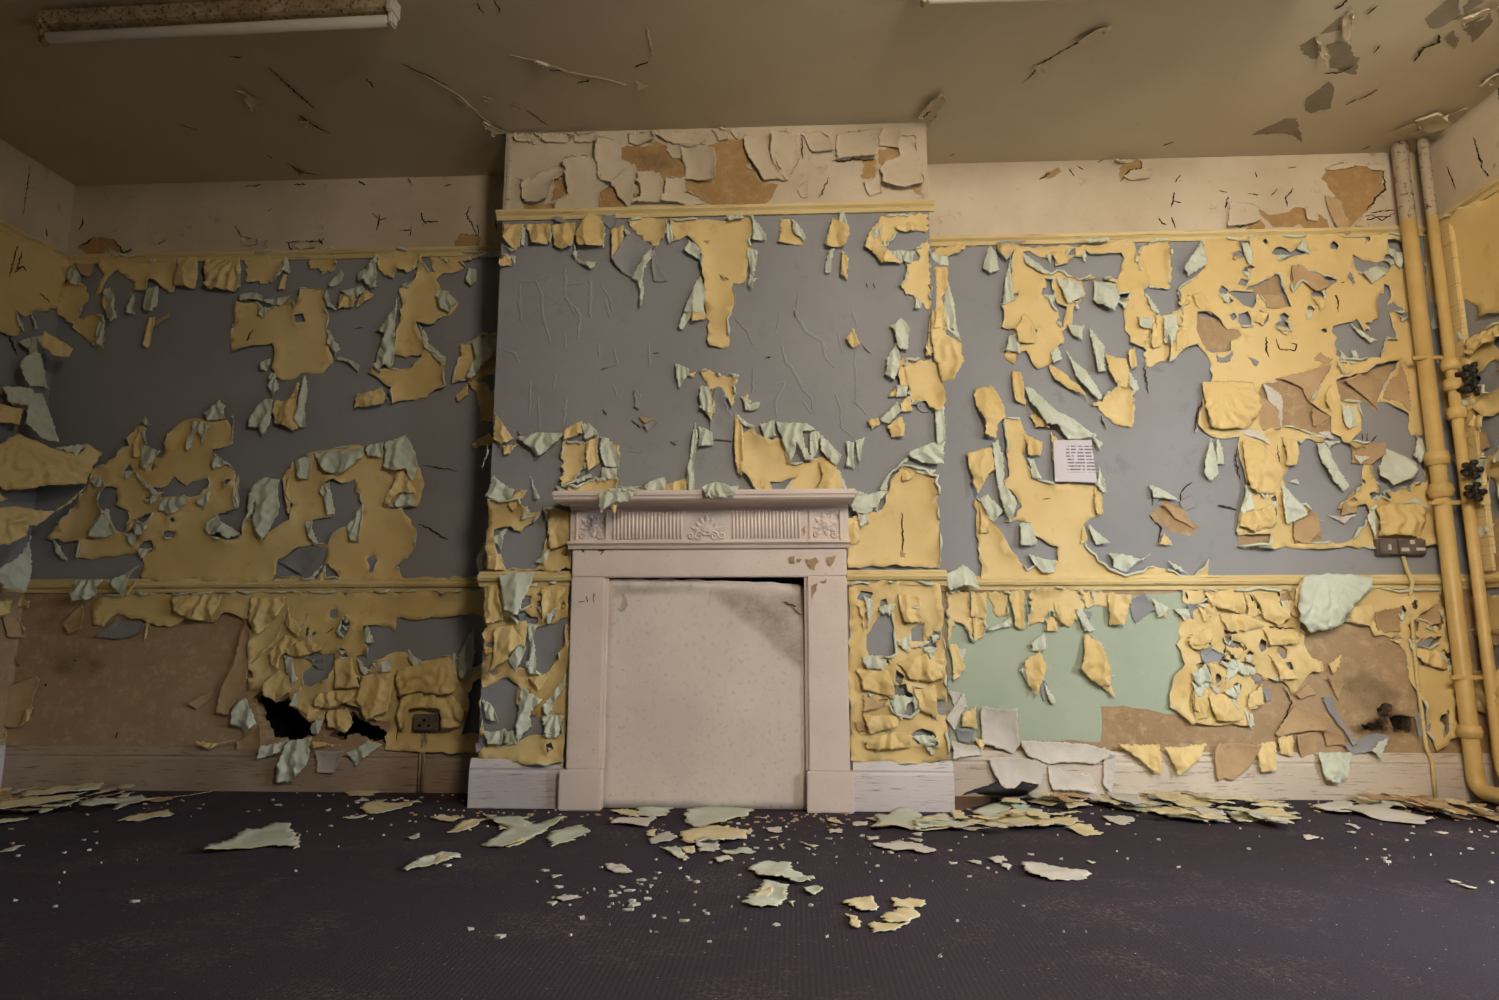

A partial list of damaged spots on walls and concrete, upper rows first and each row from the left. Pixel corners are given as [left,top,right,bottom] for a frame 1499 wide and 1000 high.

crack [509,28,654,90]
peeling [1299,0,1380,113]
peeling [1414,0,1499,62]
crack [405,64,548,137]
peeling [1422,137,1499,575]
peeling [0,94,1459,794]
peeling [1469,594,1499,646]
peeling [1473,668,1499,757]
peeling [342,790,387,819]